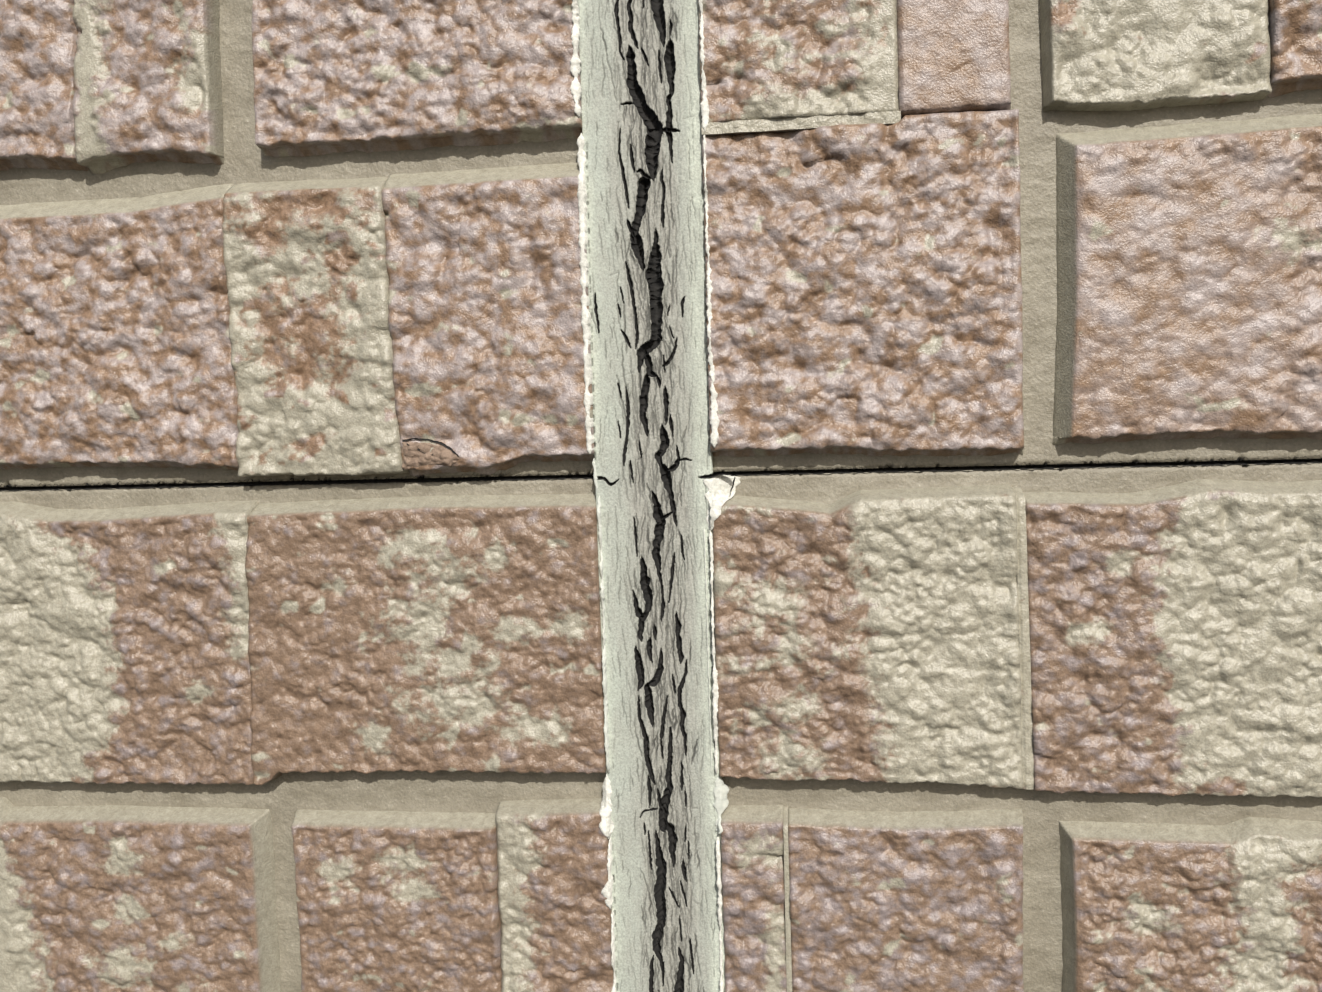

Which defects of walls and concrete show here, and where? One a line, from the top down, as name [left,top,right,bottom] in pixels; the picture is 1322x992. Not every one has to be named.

crack [592,0,737,992]
peeling [703,475,740,992]